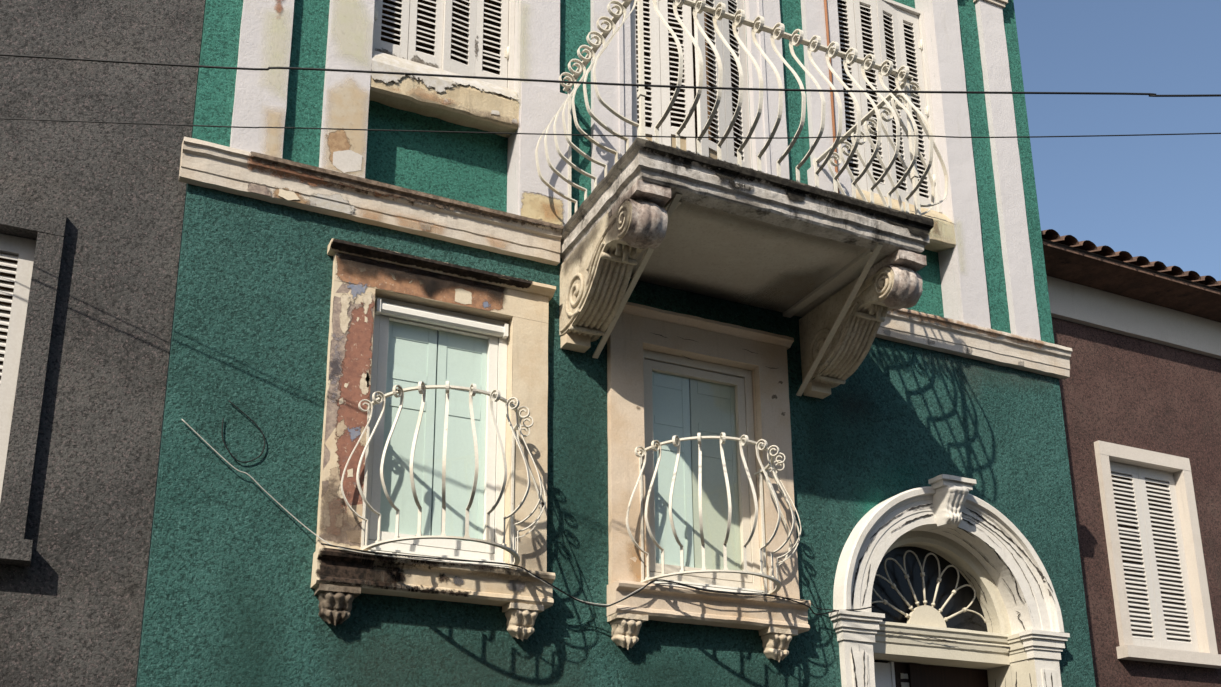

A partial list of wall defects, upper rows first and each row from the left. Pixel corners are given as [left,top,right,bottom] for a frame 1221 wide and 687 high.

peeling [371,47,520,105]
peeling [247,81,398,214]
damp [715,164,754,204]
damp [785,187,808,201]
damp [903,211,934,239]
peeling [319,253,504,547]
damp [316,547,548,597]
crack [851,504,1055,687]